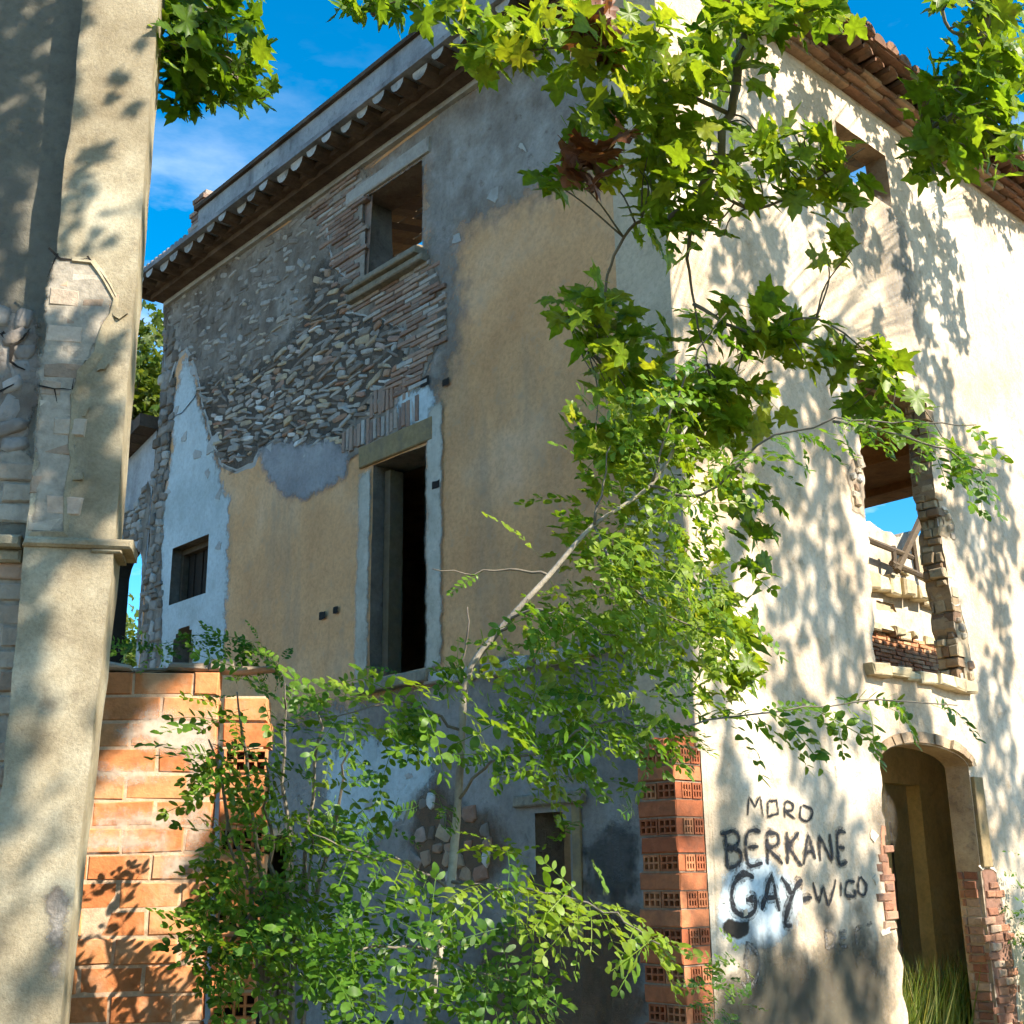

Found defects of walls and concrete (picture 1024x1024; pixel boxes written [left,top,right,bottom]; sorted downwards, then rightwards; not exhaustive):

spalling [0,256,128,537]
spalling [122,169,448,668]
spalling [847,455,866,518]
spalling [951,602,975,682]
spalling [325,735,505,884]
spalling [870,825,899,936]
spalling [957,864,1023,1024]